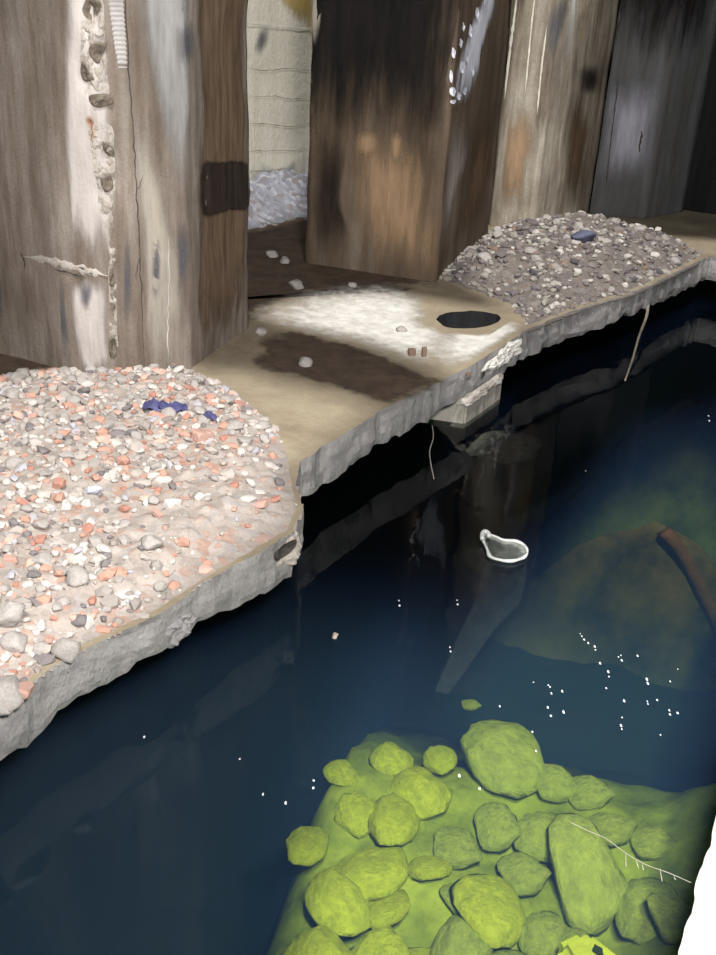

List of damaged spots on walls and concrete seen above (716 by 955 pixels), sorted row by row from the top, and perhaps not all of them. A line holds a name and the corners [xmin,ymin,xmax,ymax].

spalling [80,0,114,108]
peeling [449,0,494,104]
spalling [88,123,118,357]
crack [125,0,145,366]